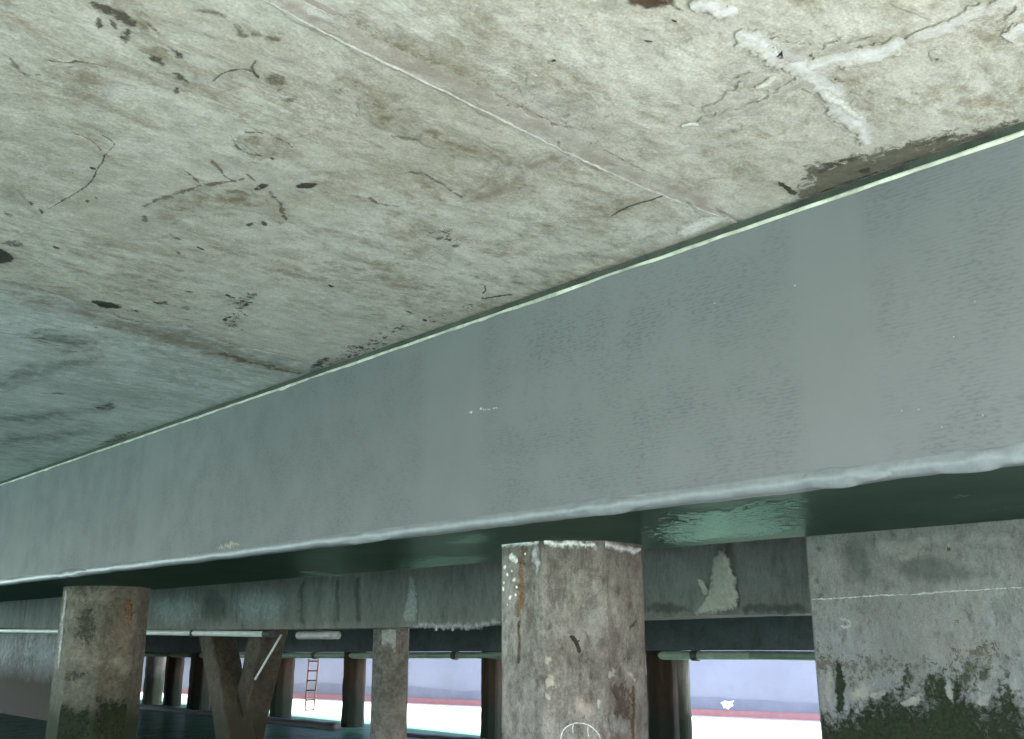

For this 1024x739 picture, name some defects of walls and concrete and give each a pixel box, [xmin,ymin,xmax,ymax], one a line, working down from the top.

leakage [682,0,1024,146]
crack [50,132,115,208]
spalling [778,120,1019,205]
crack [611,195,663,216]
leakage [835,661,846,712]
leakage [895,666,939,699]
leakage [955,663,992,692]